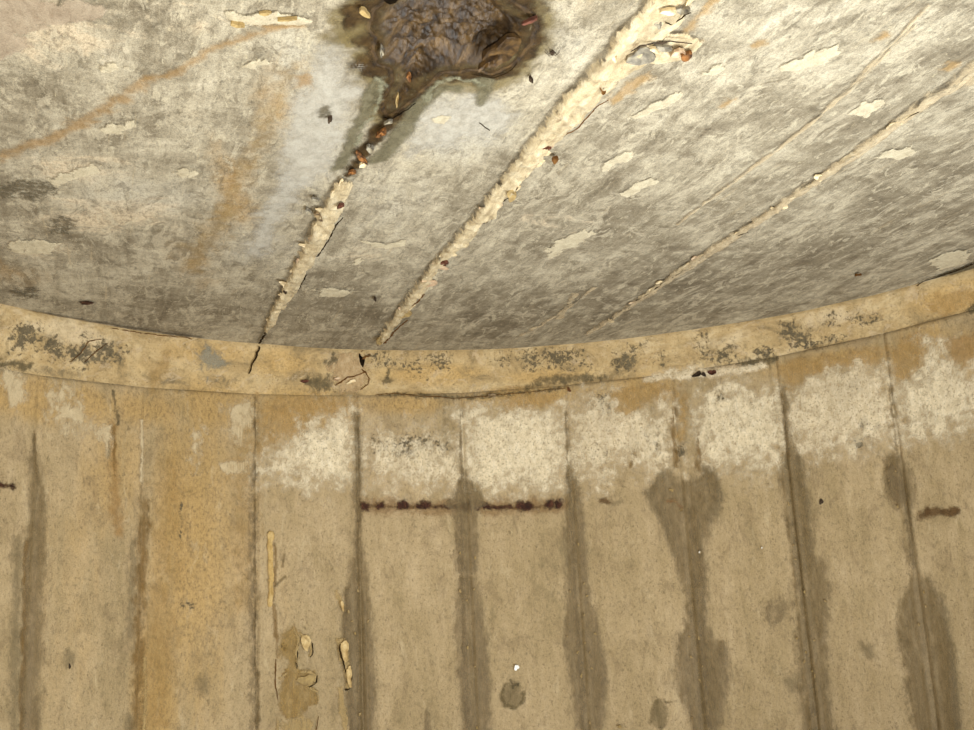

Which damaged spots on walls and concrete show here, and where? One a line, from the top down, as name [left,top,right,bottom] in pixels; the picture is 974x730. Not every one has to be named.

crack [566,100,608,135]
crack [295,217,343,291]
crack [917,250,974,286]
water stain [6,321,129,372]
crack [248,332,267,374]
crack [377,294,425,346]
water stain [779,307,879,351]
rust [360,499,562,511]
water stain [220,332,974,730]
rust [919,507,960,519]
peeling [275,627,319,730]
peeling [336,638,353,730]